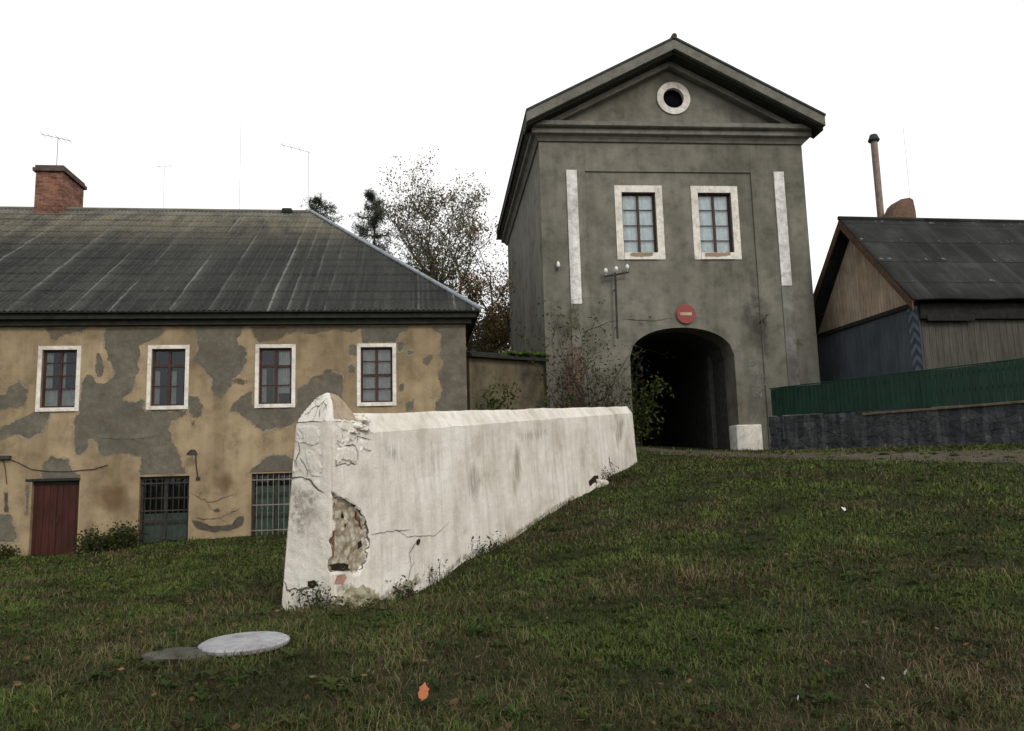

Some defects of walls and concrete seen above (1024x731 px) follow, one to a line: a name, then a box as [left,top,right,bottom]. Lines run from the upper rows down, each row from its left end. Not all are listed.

flaking render [0,380,51,440]
flaking render [39,328,203,478]
flaking render [193,326,467,477]
crack [292,396,371,493]
flaking render [328,493,380,609]
crack [370,524,448,580]